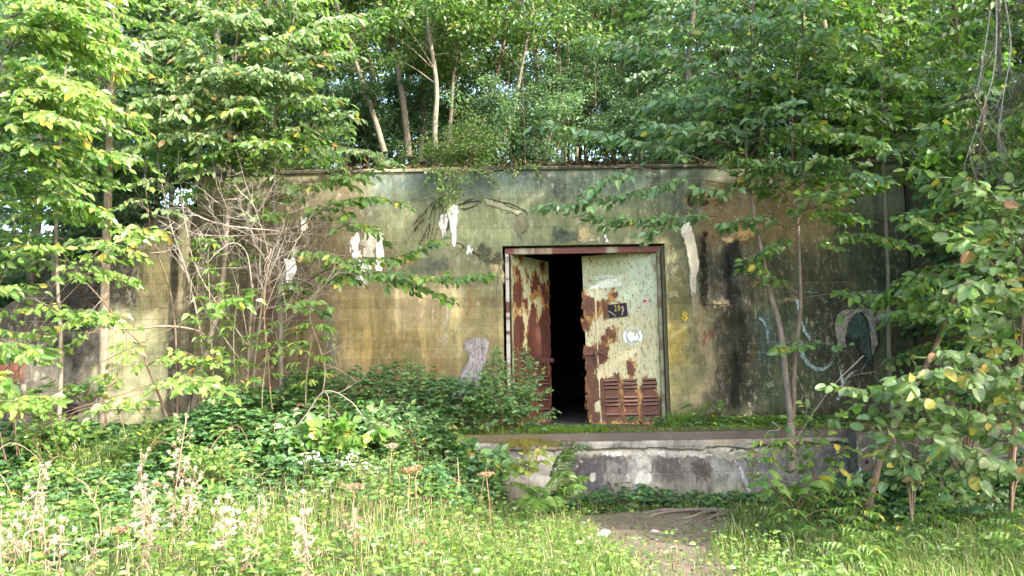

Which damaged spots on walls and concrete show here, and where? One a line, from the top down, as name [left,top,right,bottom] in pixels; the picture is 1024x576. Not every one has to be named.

corrosion [510,255,552,425]
corrosion [581,288,662,424]
water stain [681,222,708,317]
water stain [721,239,749,409]